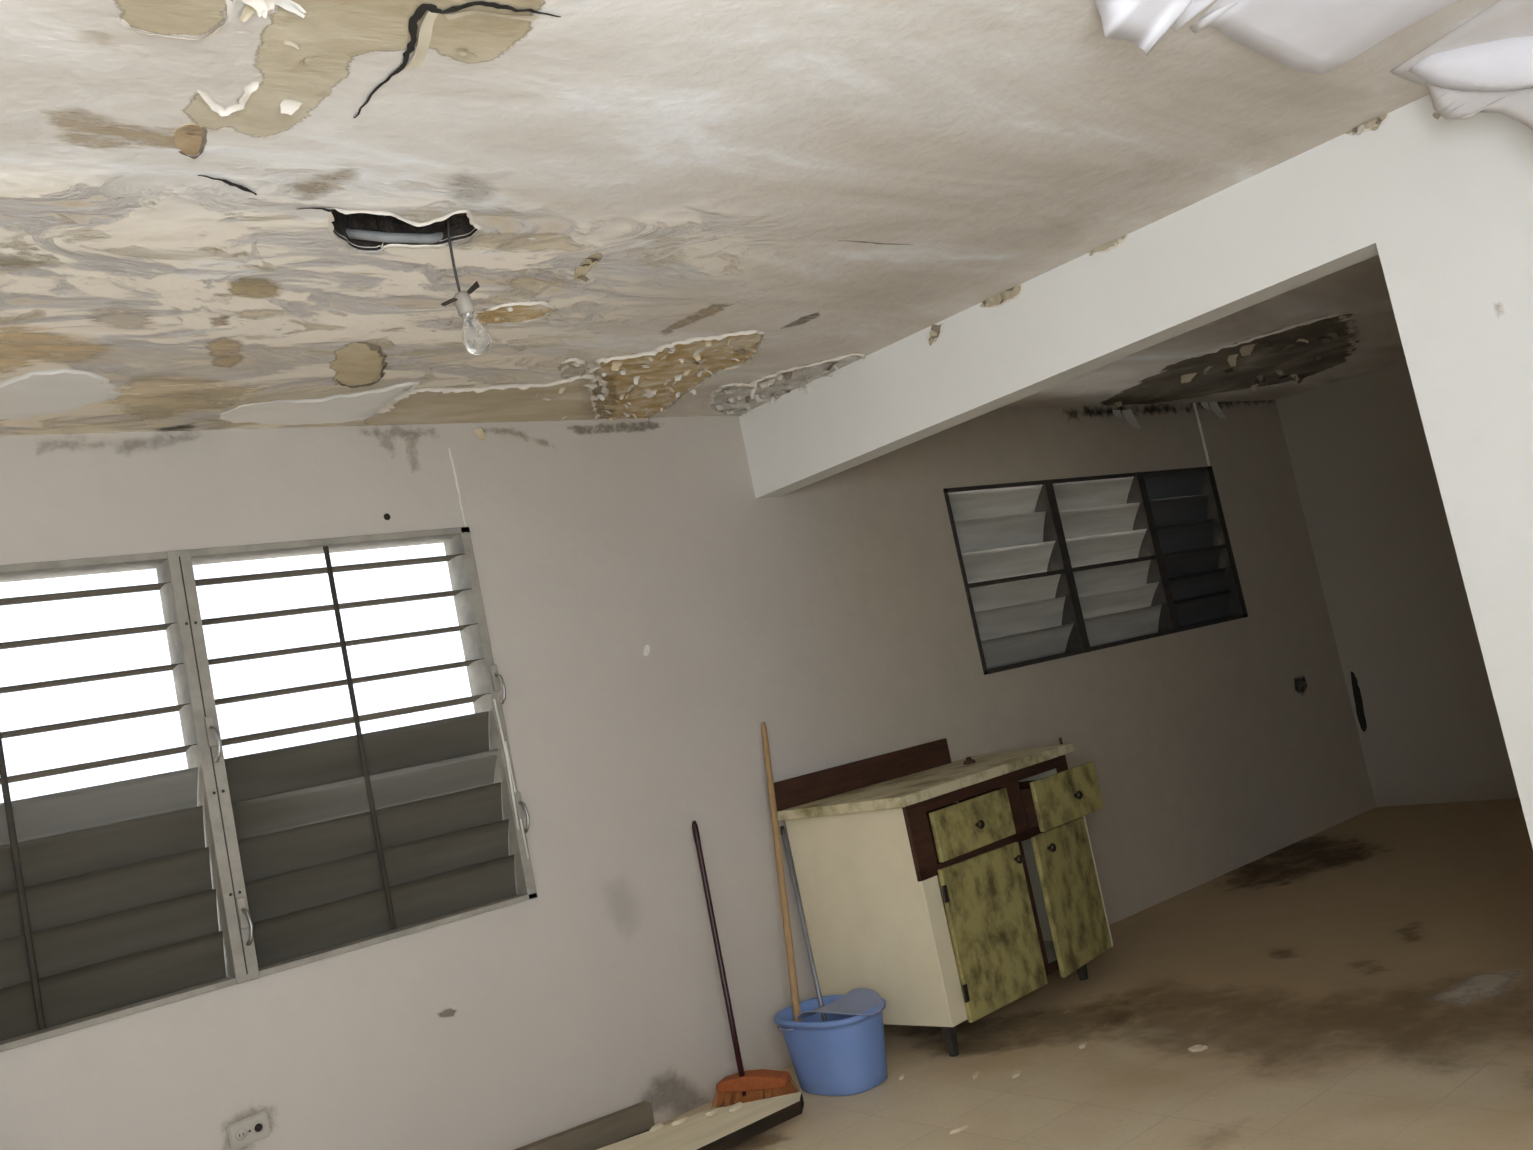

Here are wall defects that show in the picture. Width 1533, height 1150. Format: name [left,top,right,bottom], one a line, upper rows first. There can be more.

peeling [115,0,545,137]
crack [353,1,561,118]
spalling [327,208,483,255]
peeling [476,300,558,325]
peeling [574,253,602,282]
peeling [219,329,866,440]
peeling [1101,311,1361,429]
water stain [1235,838,1372,887]